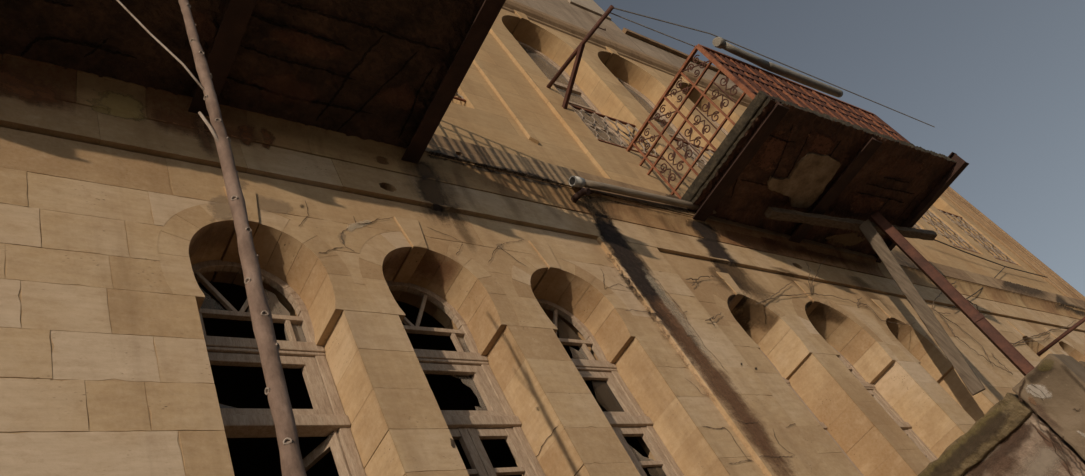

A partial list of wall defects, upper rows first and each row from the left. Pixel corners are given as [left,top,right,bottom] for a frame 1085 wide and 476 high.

leakage [410,162,458,219]
crack [319,216,393,253]
leakage [582,190,787,475]